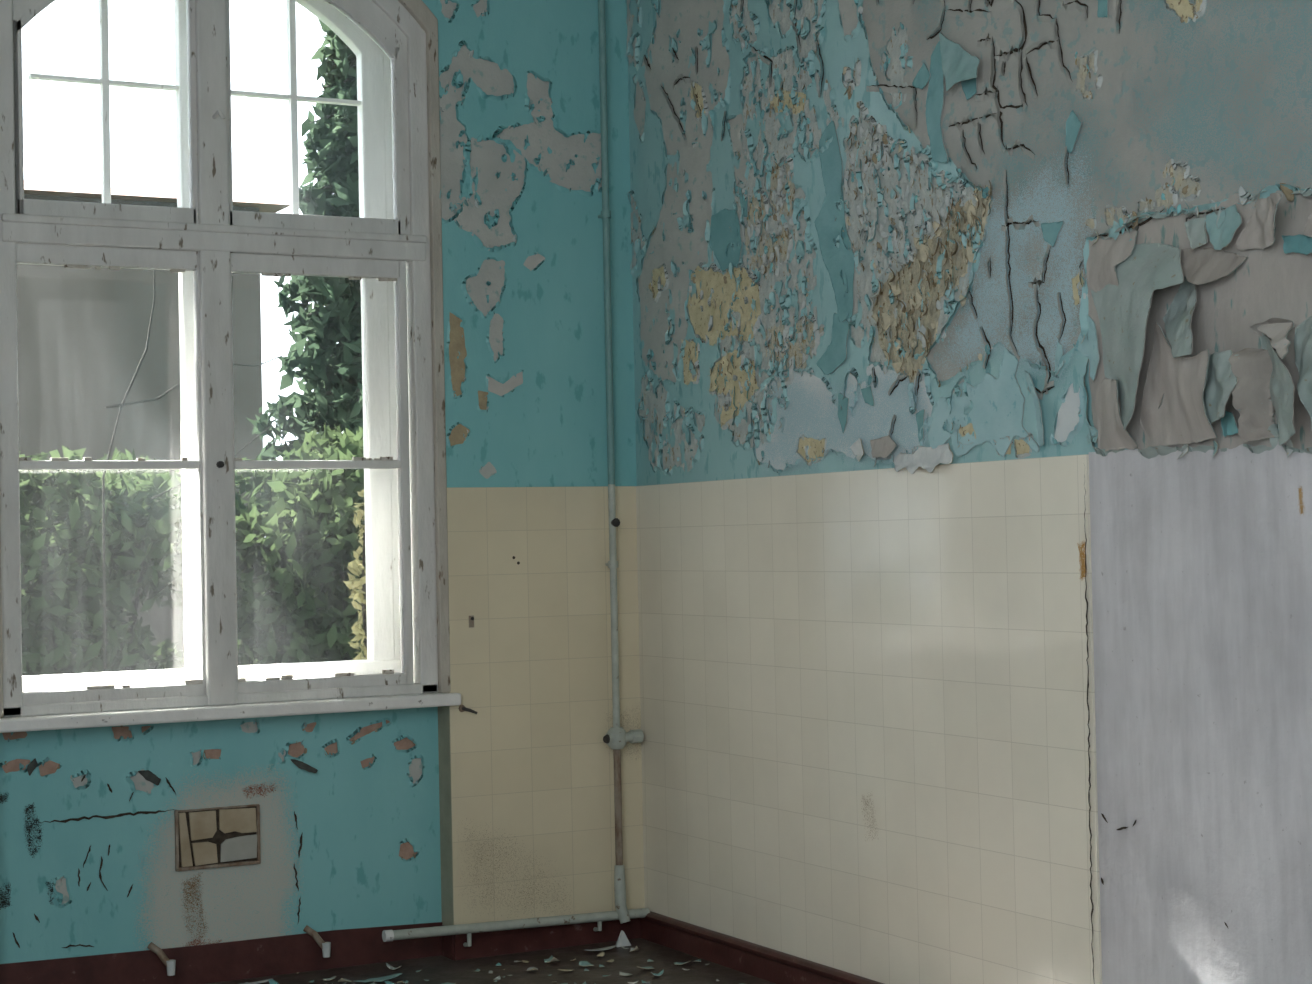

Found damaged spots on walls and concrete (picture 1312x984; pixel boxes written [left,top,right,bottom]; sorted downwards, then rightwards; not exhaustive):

crack [866,84,917,129]
crack [911,0,1122,400]
peeling [439,40,602,413]
peeling [633,0,1312,474]
flaking render [446,422,471,448]
flaking render [2,732,27,742]
flaking render [0,757,91,790]
flaking render [108,724,154,742]
peeling [126,769,161,796]
flaking render [277,717,425,788]
crack [37,775,176,897]
flaking render [399,838,420,862]